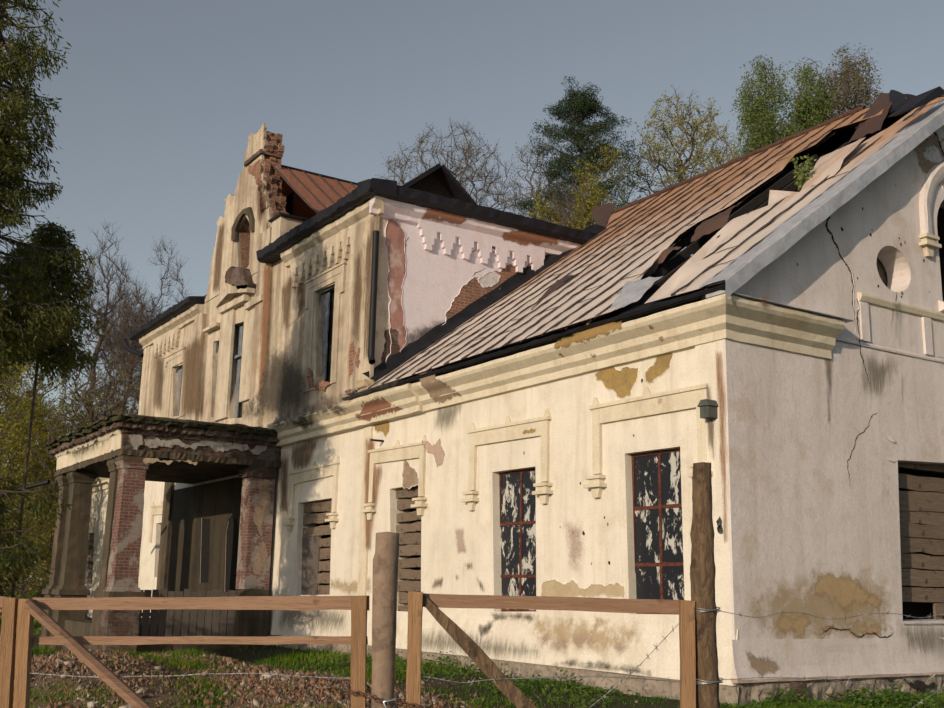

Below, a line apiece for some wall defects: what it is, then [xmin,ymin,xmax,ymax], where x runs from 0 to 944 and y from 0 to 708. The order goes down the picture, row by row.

flaking render [913,134,944,174]
flaking render [381,218,407,364]
flaking render [444,230,558,324]
crack [825,214,872,388]
peeling [128,434,267,465]
damp [243,354,396,426]
flaking render [356,397,402,438]
flaking render [594,353,674,400]
crack [847,413,877,487]
peeling [253,479,271,576]
peeling [541,579,626,599]
peeling [756,573,886,639]